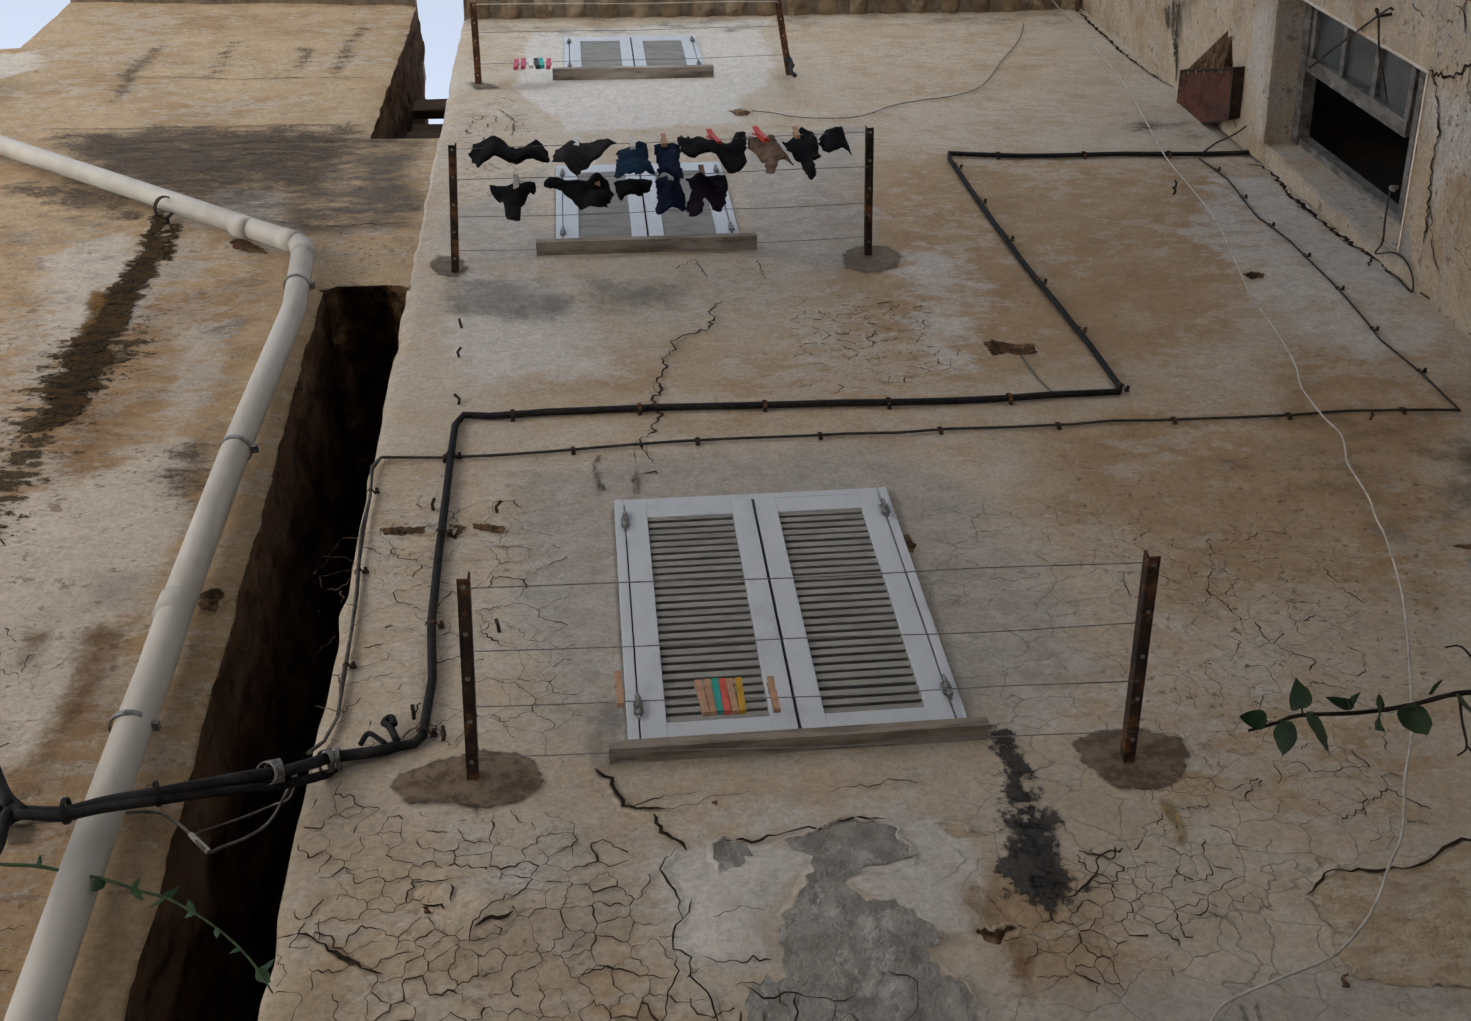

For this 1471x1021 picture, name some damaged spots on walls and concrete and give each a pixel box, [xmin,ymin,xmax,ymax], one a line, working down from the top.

damp [156,223,184,265]
damp [52,123,366,195]
crack [1246,163,1391,272]
crack [1411,0,1471,273]
damp [93,314,165,395]
flaking render [978,338,1041,358]
crack [314,494,584,751]
crack [275,768,787,1021]
peeling [705,813,986,1021]
mould [988,725,1092,914]
crack [990,518,1431,993]
peeling [1290,827,1471,1003]